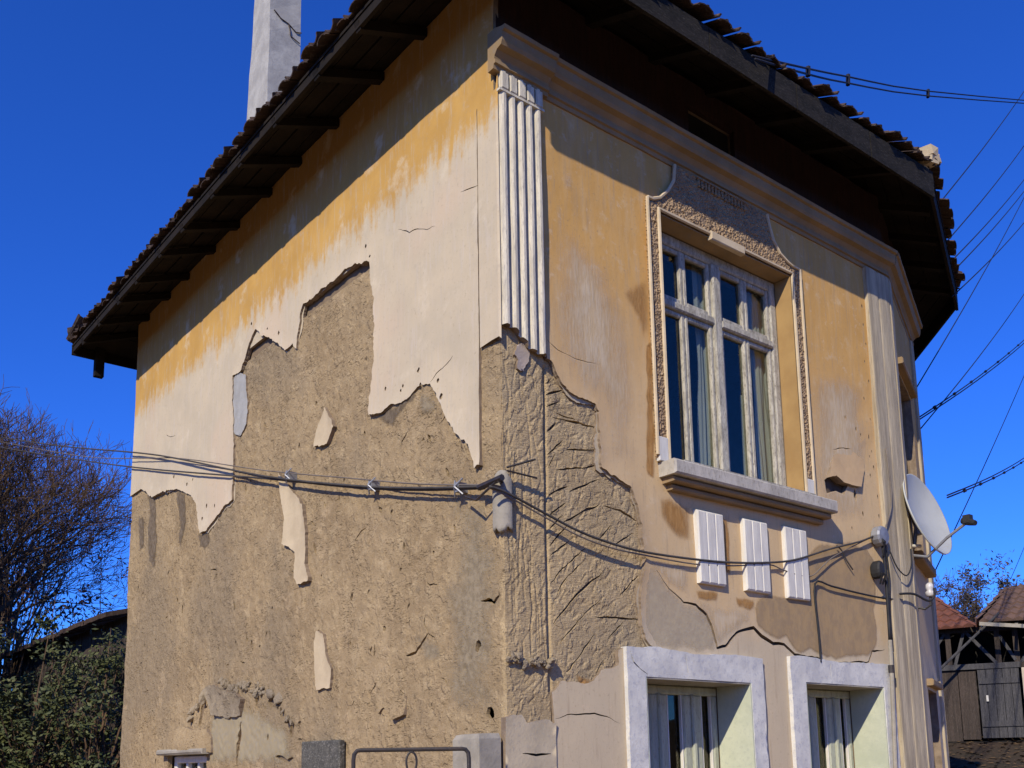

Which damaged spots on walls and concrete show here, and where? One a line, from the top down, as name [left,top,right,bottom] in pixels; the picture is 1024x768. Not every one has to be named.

damp [380,394,433,424]
damp [139,495,157,567]
damp [177,491,185,545]
damp [199,534,209,548]
peeling [120,253,646,768]
crack [716,627,815,658]